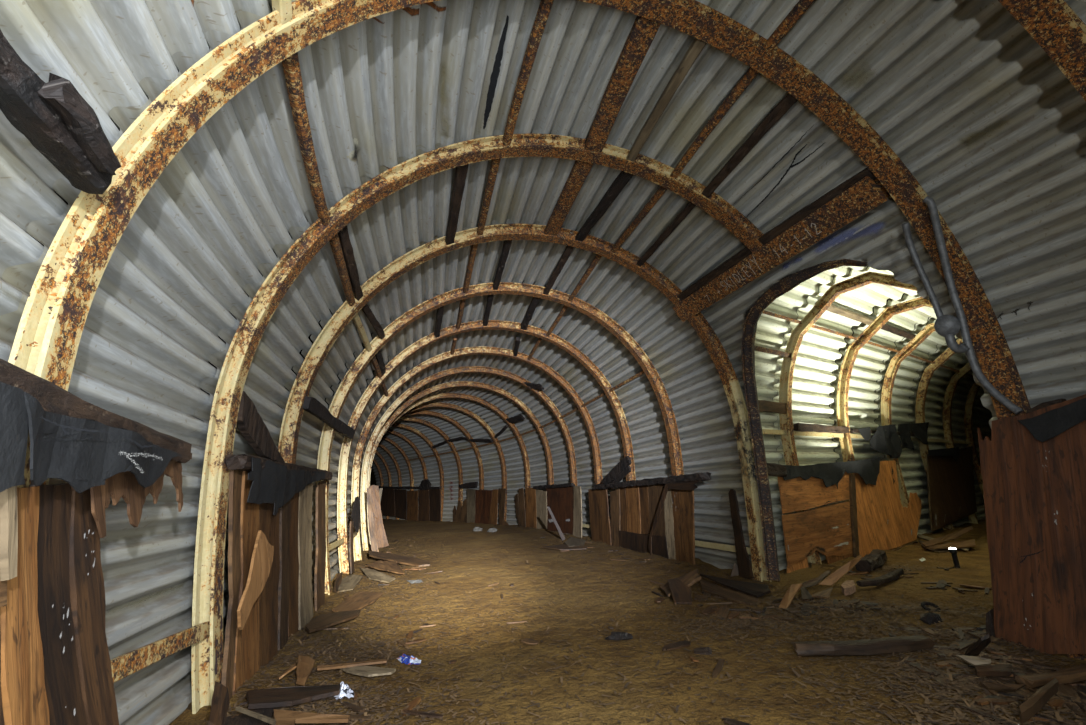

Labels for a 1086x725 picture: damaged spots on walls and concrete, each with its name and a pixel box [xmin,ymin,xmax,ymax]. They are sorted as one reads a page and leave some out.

corrosion [402,2,448,16]